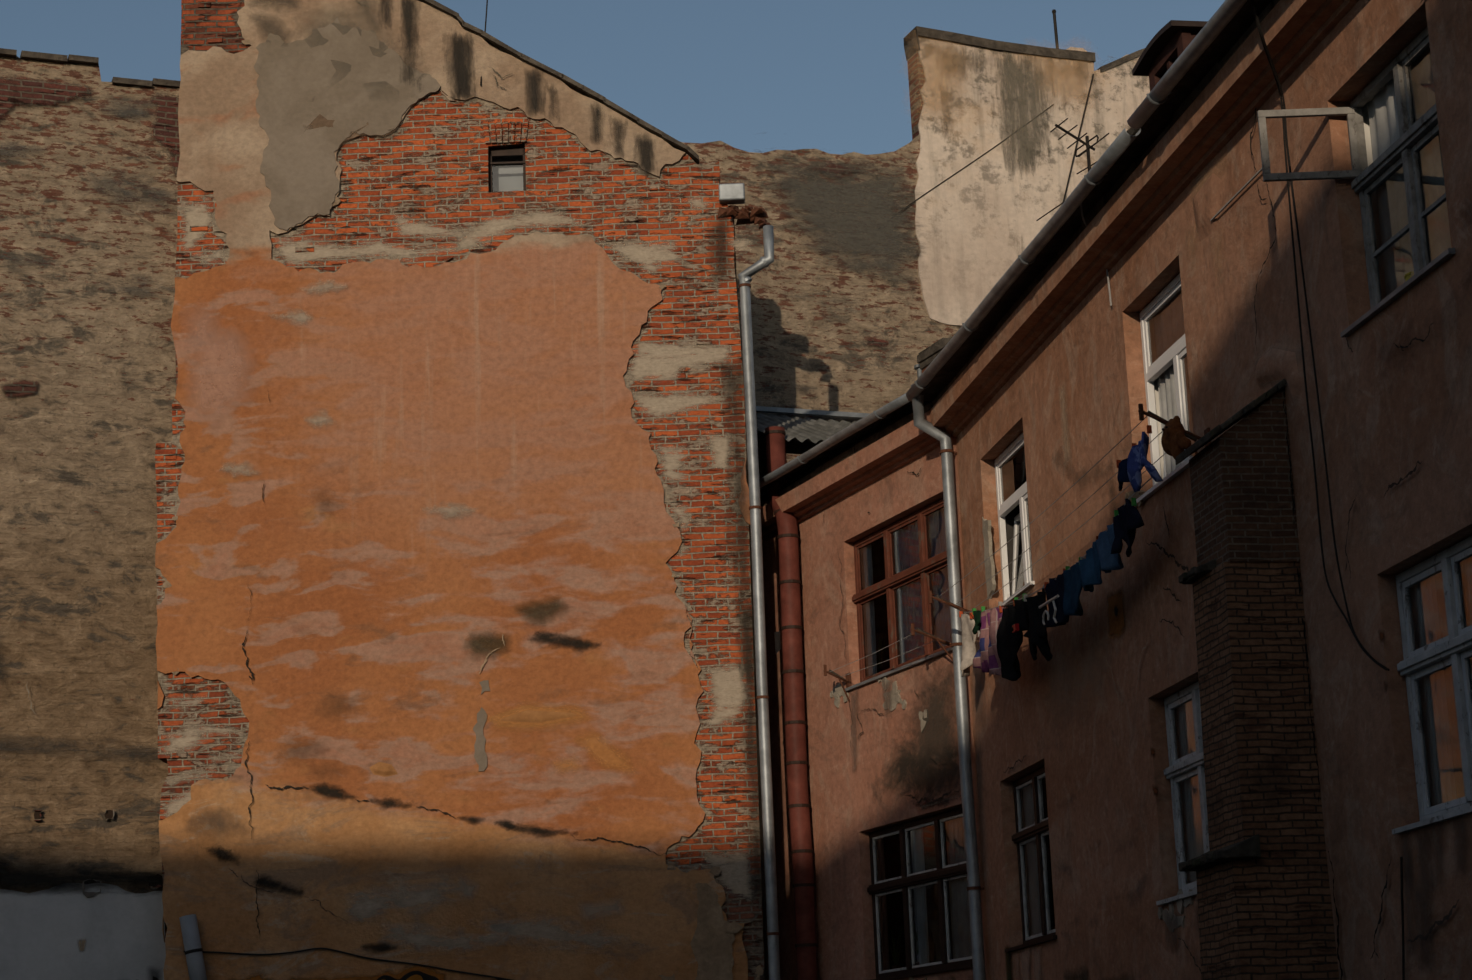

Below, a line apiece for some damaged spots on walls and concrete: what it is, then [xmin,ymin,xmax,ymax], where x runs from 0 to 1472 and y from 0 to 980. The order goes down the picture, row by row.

flaking render [181,0,251,55]
water stain [381,0,417,71]
water stain [451,38,472,96]
water stain [592,107,653,173]
water stain [938,50,1086,170]
flaking render [175,182,230,279]
crack [1250,108,1276,350]
flaking render [270,90,762,923]
crack [1145,507,1190,637]
flaking render [158,669,249,820]
crack [1297,568,1320,801]
crack [1328,851,1459,980]